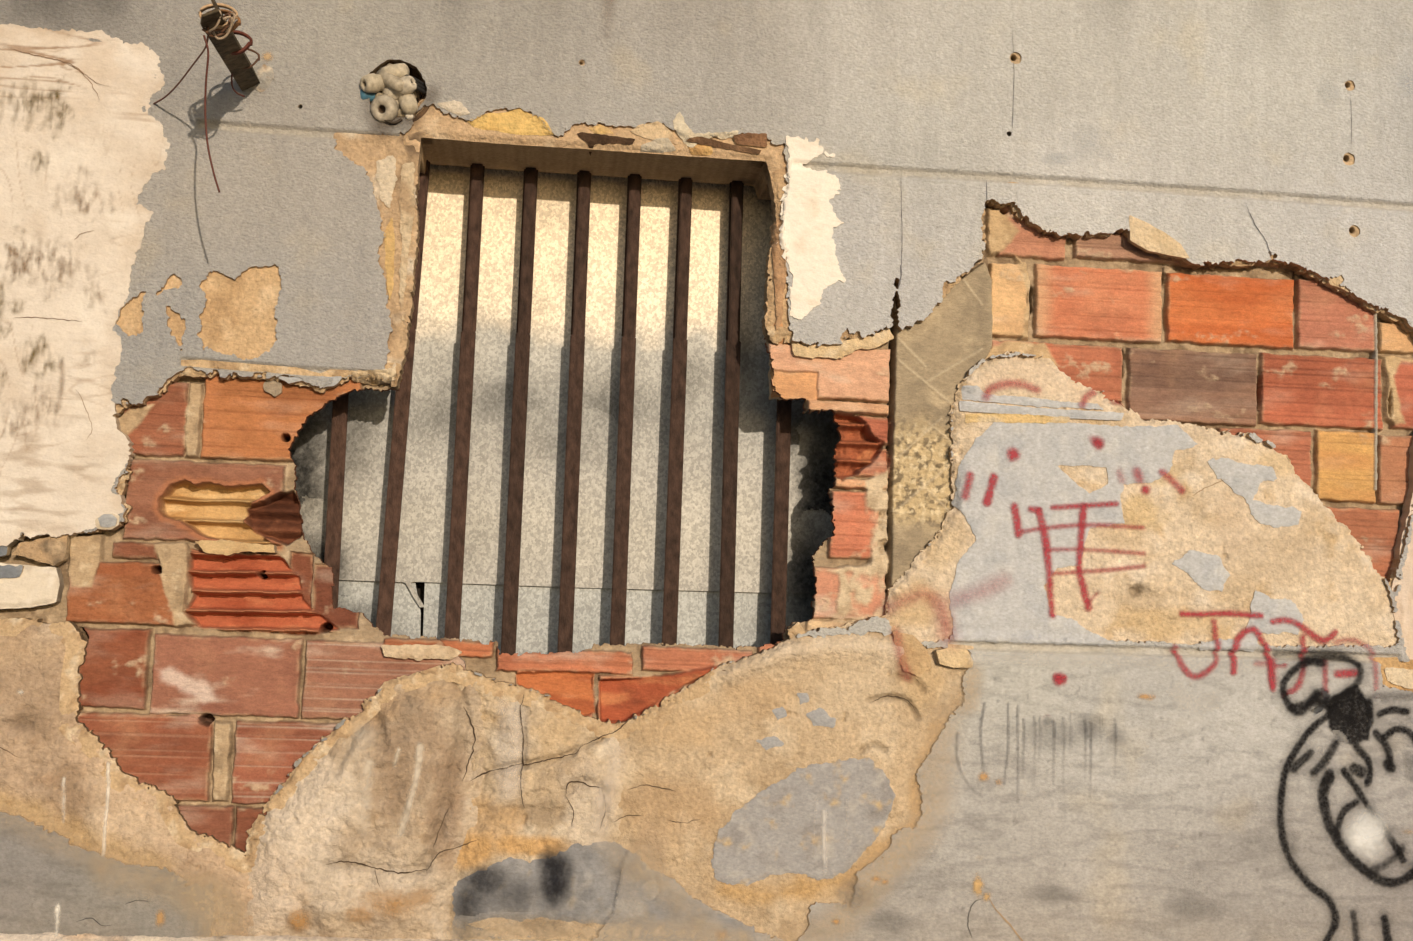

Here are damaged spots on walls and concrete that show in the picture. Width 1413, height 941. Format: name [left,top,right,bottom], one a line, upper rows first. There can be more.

spalling [0,99,785,936]
peeling [381,155,1413,941]